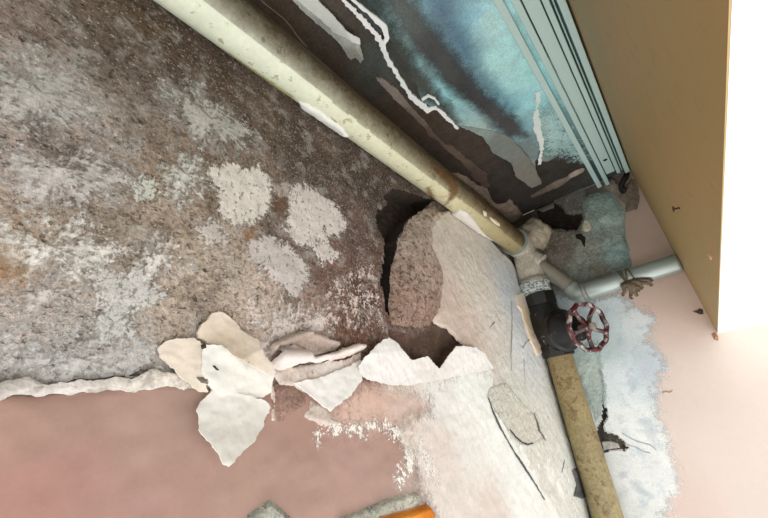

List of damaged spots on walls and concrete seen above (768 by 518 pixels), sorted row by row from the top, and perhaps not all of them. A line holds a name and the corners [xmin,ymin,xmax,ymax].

peeling [299,101,349,137]
peeling [293,0,364,63]
peeling [342,0,551,188]
leakage [360,0,592,164]
leakage [0,43,385,385]
flaking render [535,202,583,231]
peeling [0,311,493,467]
crack [488,398,546,500]
crack [597,370,657,454]